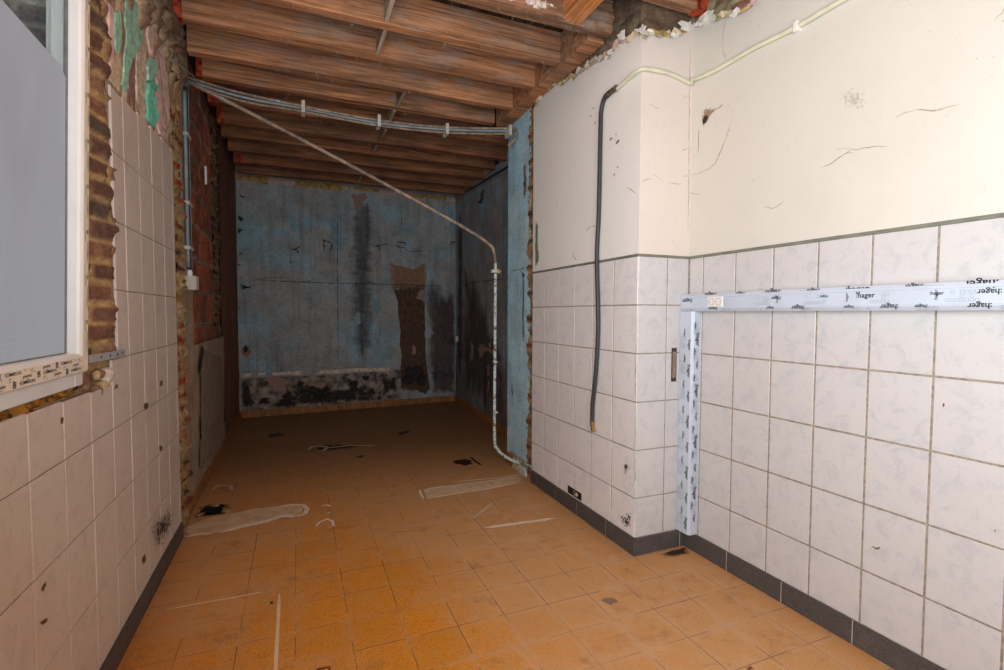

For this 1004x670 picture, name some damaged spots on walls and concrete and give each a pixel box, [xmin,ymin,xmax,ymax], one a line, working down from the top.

damp [509,0,554,10]
flaking render [534,0,756,105]
flaking render [71,0,170,395]
flaking render [209,111,223,338]
flaking render [236,147,508,211]
crack [826,146,886,166]
damp [241,205,501,411]
flaking render [315,262,430,394]